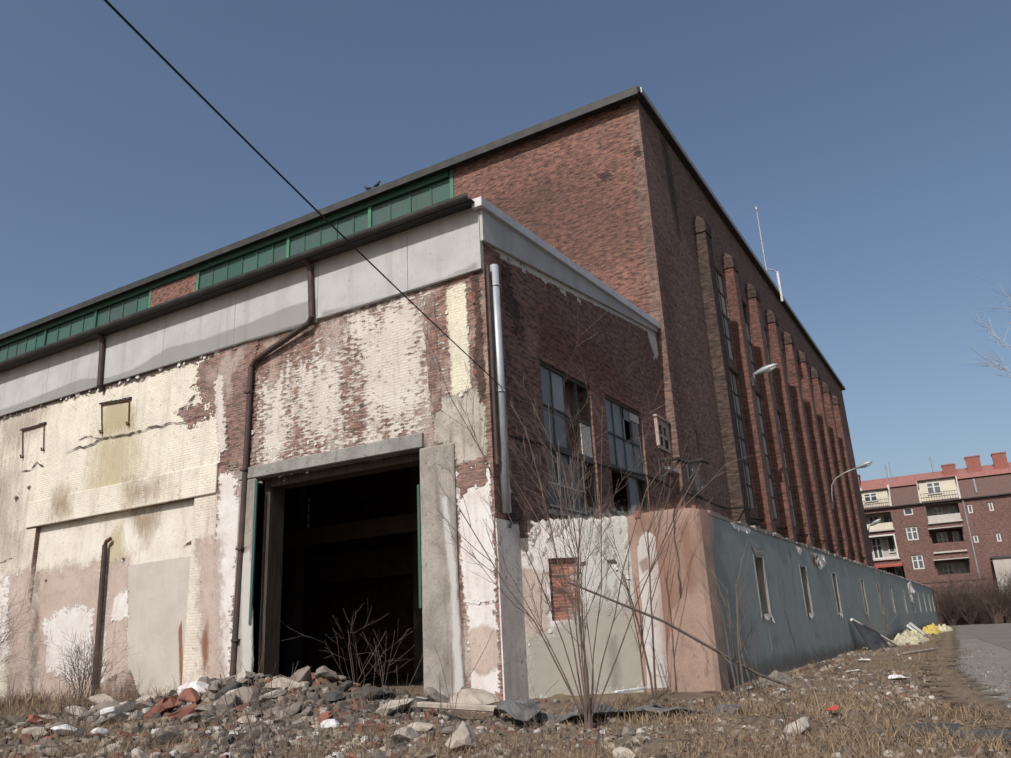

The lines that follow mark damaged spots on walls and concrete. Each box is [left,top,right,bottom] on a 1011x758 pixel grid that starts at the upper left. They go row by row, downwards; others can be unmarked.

spalling [482,242,659,359]
crack [66,394,203,453]
peeling [0,271,501,701]
peeling [507,489,570,638]
flaking render [795,546,826,570]
flaking render [882,581,922,614]